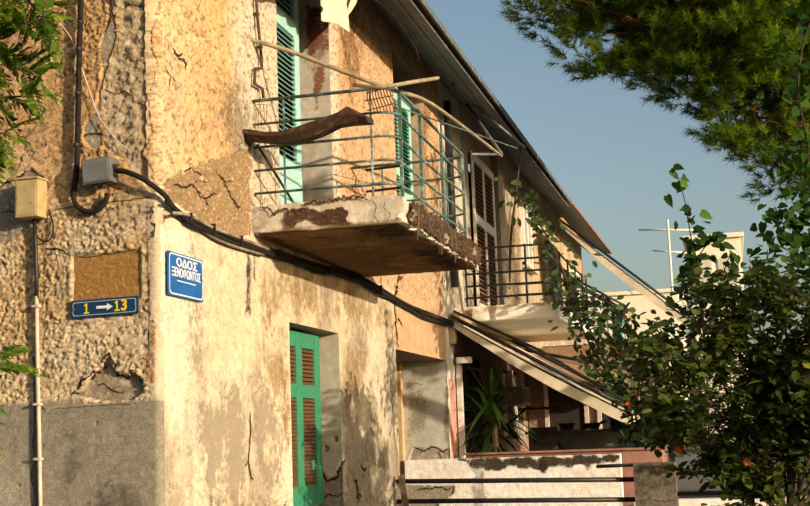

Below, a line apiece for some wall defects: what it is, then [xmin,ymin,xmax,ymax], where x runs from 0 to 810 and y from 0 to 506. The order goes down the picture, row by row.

flaking render [85,0,371,236]
flaking render [0,171,39,243]
crack [171,171,242,212]
crack [51,197,163,376]
crack [394,275,403,348]
flaking render [71,352,143,402]
crack [245,412,254,480]
crack [323,465,367,502]
leakage [458,453,620,473]